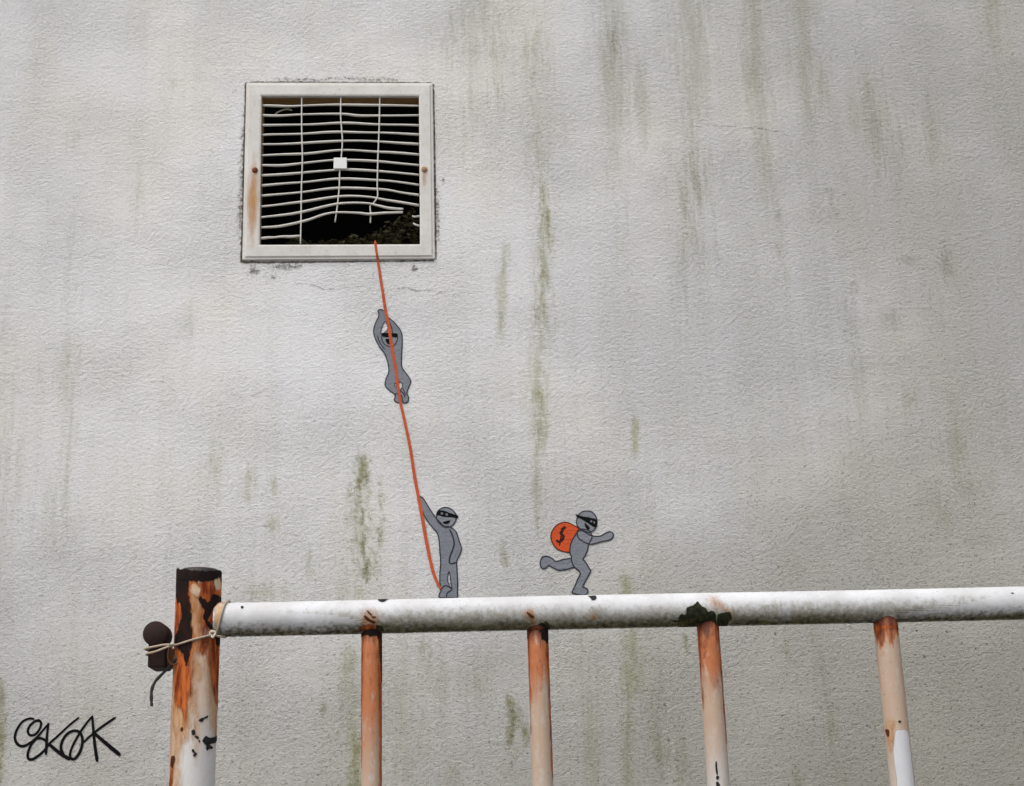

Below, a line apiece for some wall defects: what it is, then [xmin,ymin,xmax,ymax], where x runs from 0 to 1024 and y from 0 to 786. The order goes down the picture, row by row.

rust [249,180,257,222]
rust [169,577,223,786]